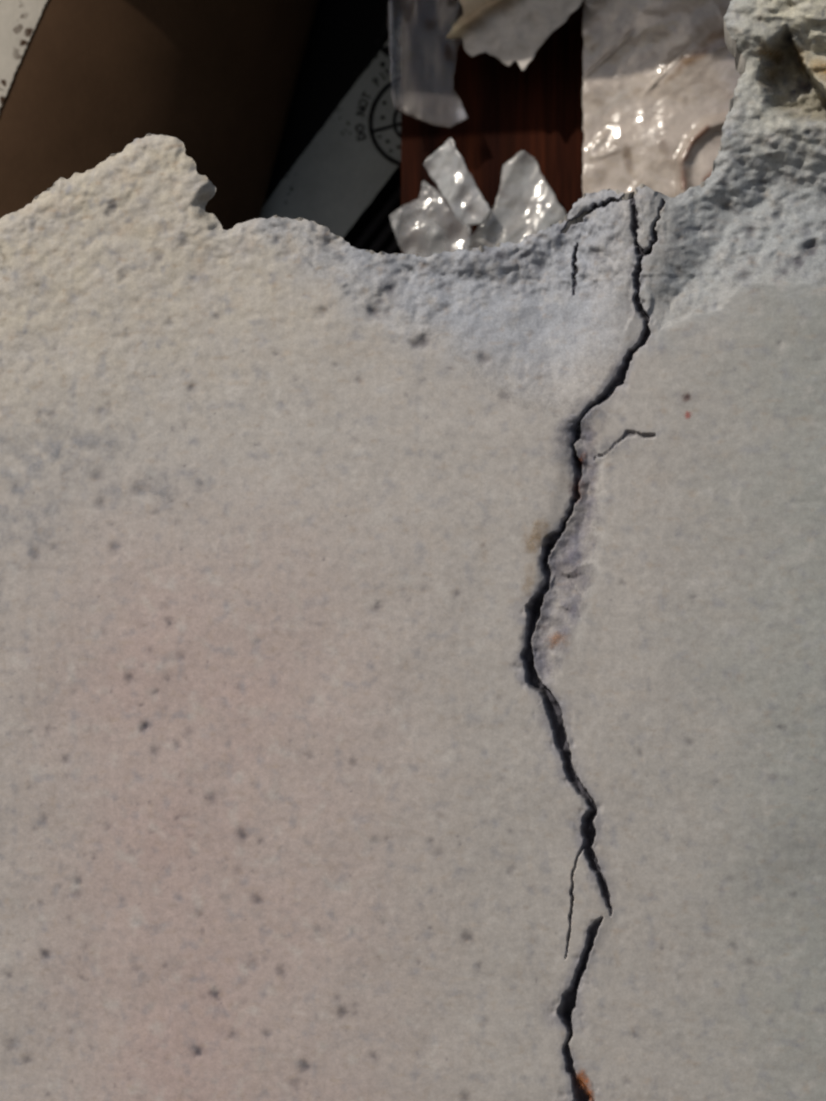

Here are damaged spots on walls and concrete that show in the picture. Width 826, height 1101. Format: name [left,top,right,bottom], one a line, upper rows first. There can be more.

crack [521,190,666,1101]